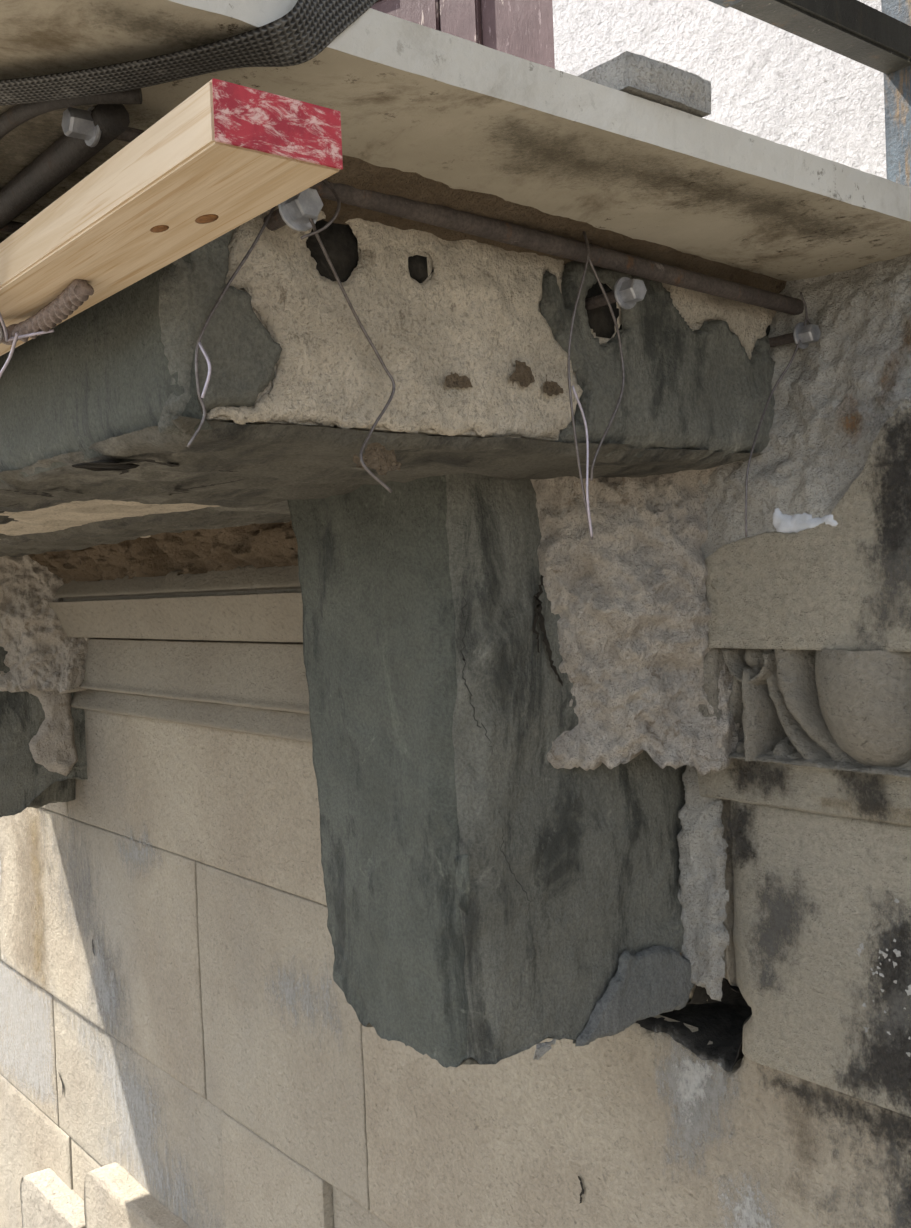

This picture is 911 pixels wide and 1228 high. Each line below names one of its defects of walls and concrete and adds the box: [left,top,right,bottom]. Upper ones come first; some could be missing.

spalling [206,205,583,439]
spalling [662,283,776,360]
spalling [0,499,219,536]
damp [857,413,911,647]
spalling [0,521,298,776]
flaking render [530,466,752,1072]
damp [764,891,911,1228]